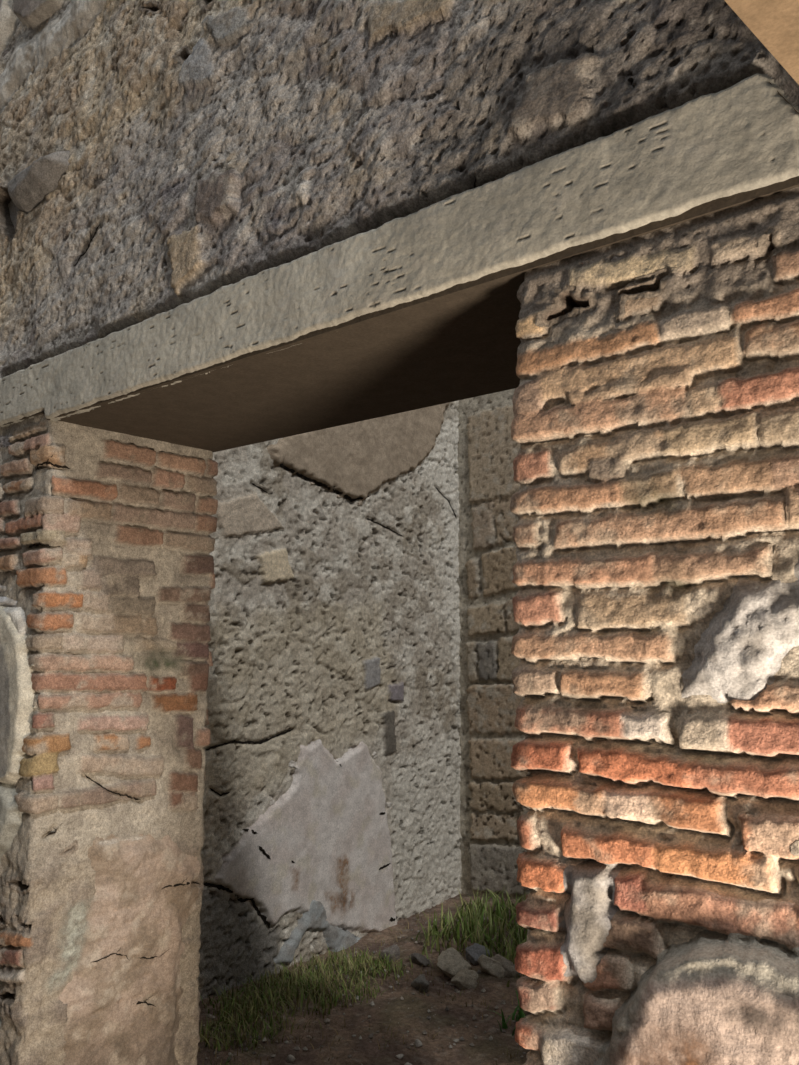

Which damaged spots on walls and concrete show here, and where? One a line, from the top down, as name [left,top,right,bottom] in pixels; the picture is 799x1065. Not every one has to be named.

crack [206,728,294,750]
crack [162,879,270,928]